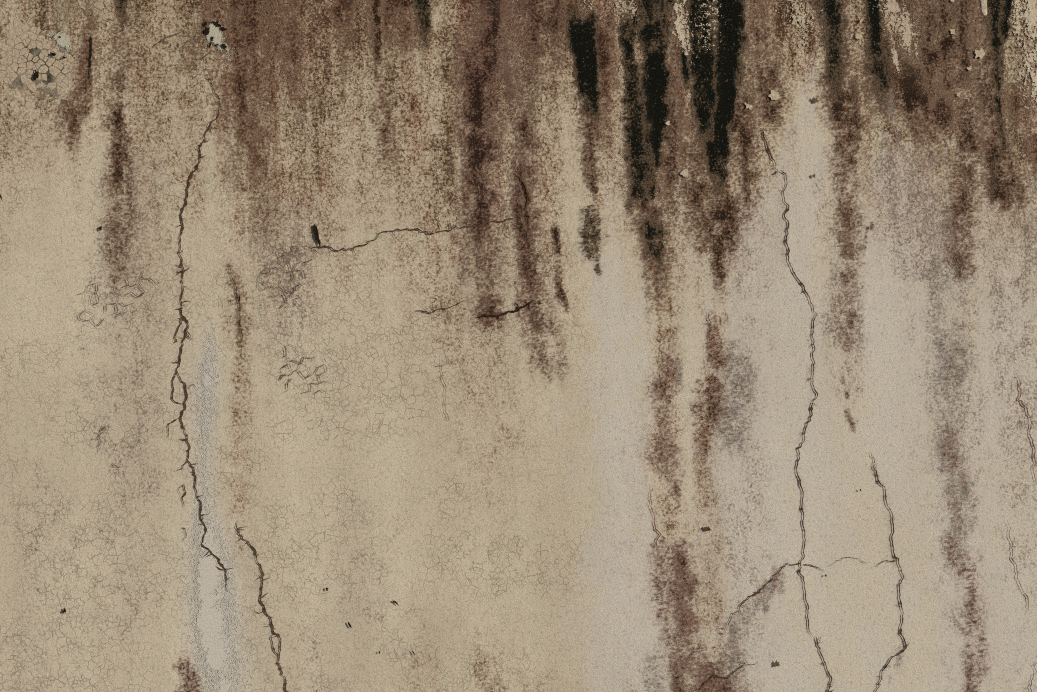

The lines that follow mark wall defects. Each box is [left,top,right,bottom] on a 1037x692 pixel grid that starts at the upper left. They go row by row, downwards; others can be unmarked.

peeling [0,20,81,99]
damp [56,0,141,291]
crack [79,53,288,692]
peeling [203,18,236,62]
damp [181,0,308,243]
crack [280,345,328,394]
crack [228,168,541,348]
damp [451,0,593,380]
damp [577,107,608,275]
crack [720,126,910,692]
damp [612,0,1037,692]
crack [698,660,759,692]